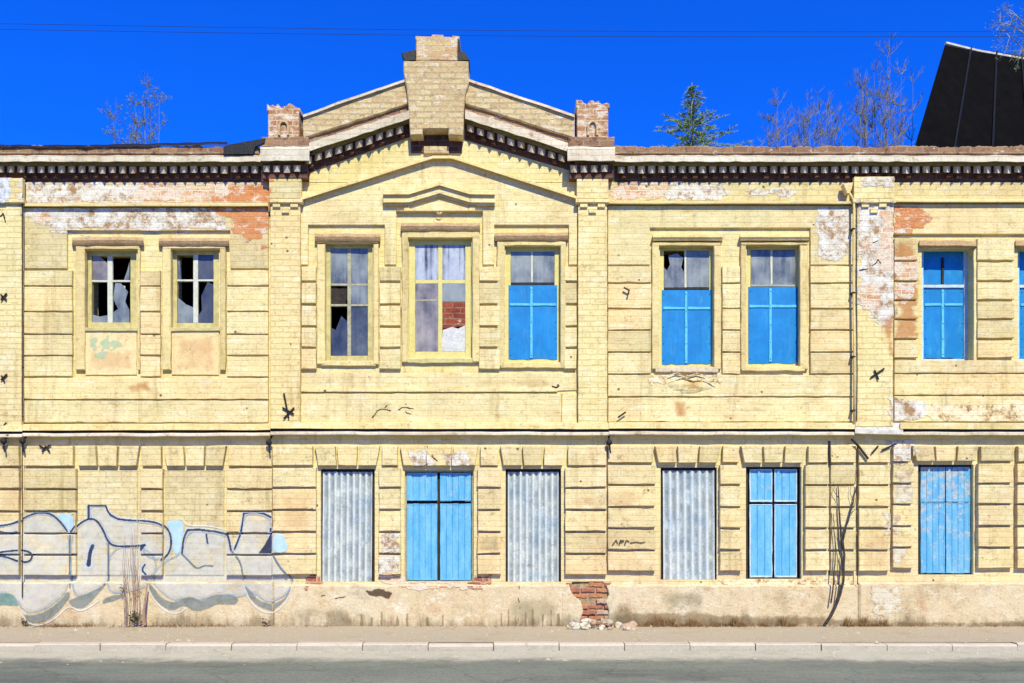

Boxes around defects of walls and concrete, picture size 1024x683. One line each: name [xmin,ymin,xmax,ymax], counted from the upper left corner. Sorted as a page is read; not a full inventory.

peeling [610,181,729,200]
peeling [0,178,274,249]
peeling [815,177,933,327]
peeling [888,397,1024,421]
peeling [408,450,470,468]
peeling [366,532,492,599]
spalling [562,582,613,626]